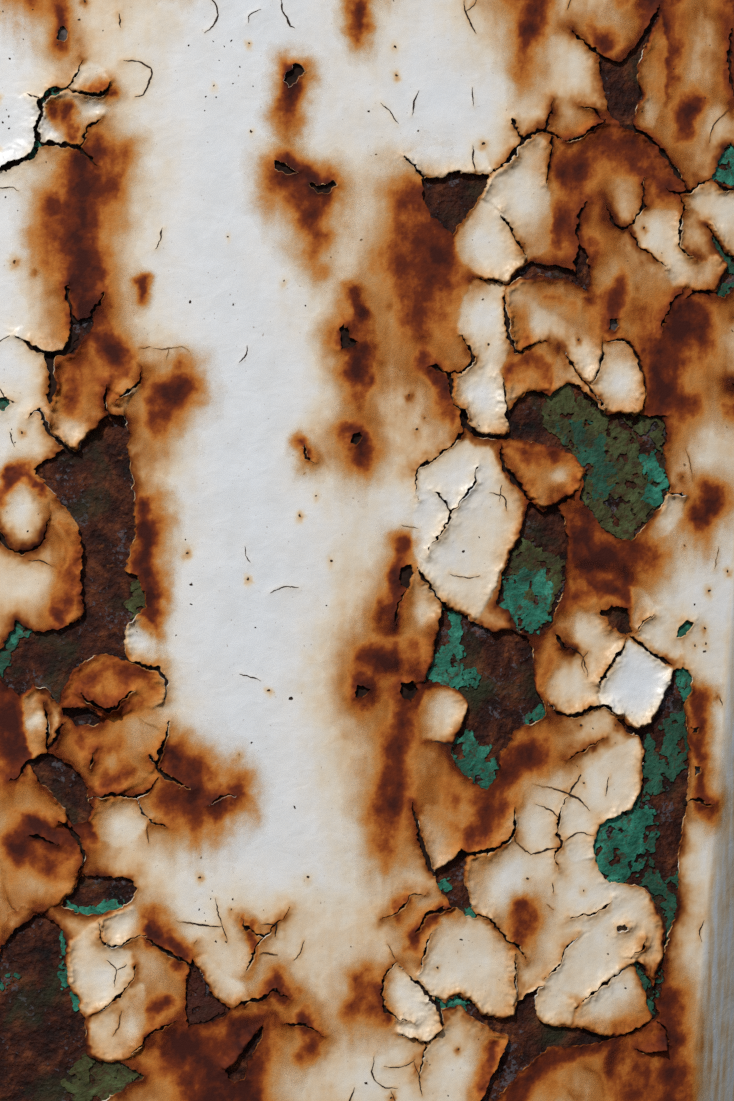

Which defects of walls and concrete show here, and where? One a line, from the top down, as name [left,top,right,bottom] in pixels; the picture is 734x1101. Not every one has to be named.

crack [0,285,104,457]
peeling [0,62,111,167]
corrosion [22,75,210,458]
corrosion [256,50,477,485]
crack [472,102,734,266]
corrosion [492,0,734,470]
peeling [0,838,146,1101]
peeling [0,292,166,848]
corrosion [0,650,261,951]
crack [92,899,304,1053]
crack [349,614,670,1101]
peeling [383,136,700,1101]